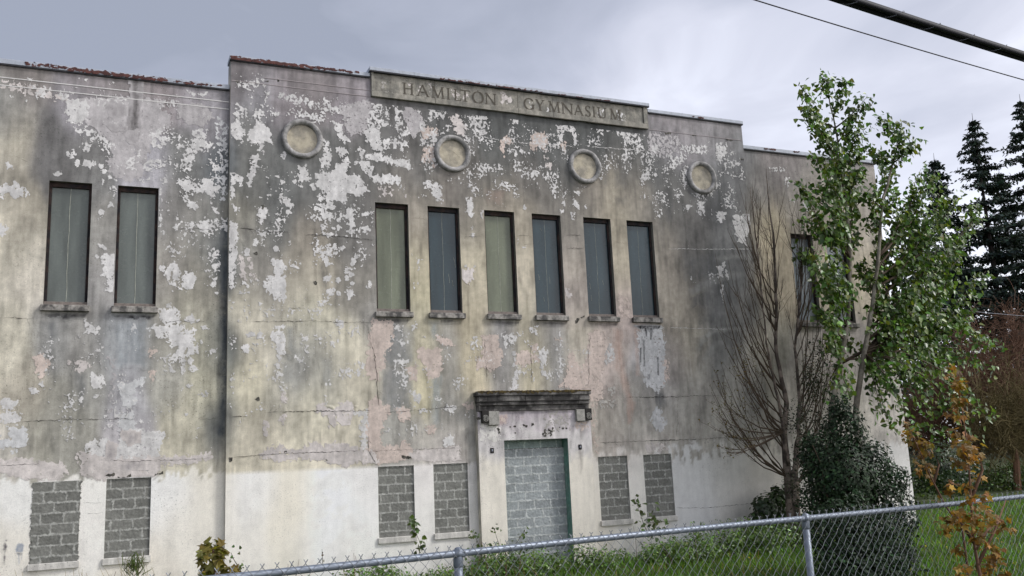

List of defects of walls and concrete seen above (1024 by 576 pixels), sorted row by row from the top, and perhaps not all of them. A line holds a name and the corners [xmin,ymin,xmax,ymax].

damp [222,90,230,126]
damp [213,214,264,441]
damp [315,259,332,304]
crack [204,315,452,466]
peeling [0,73,750,482]